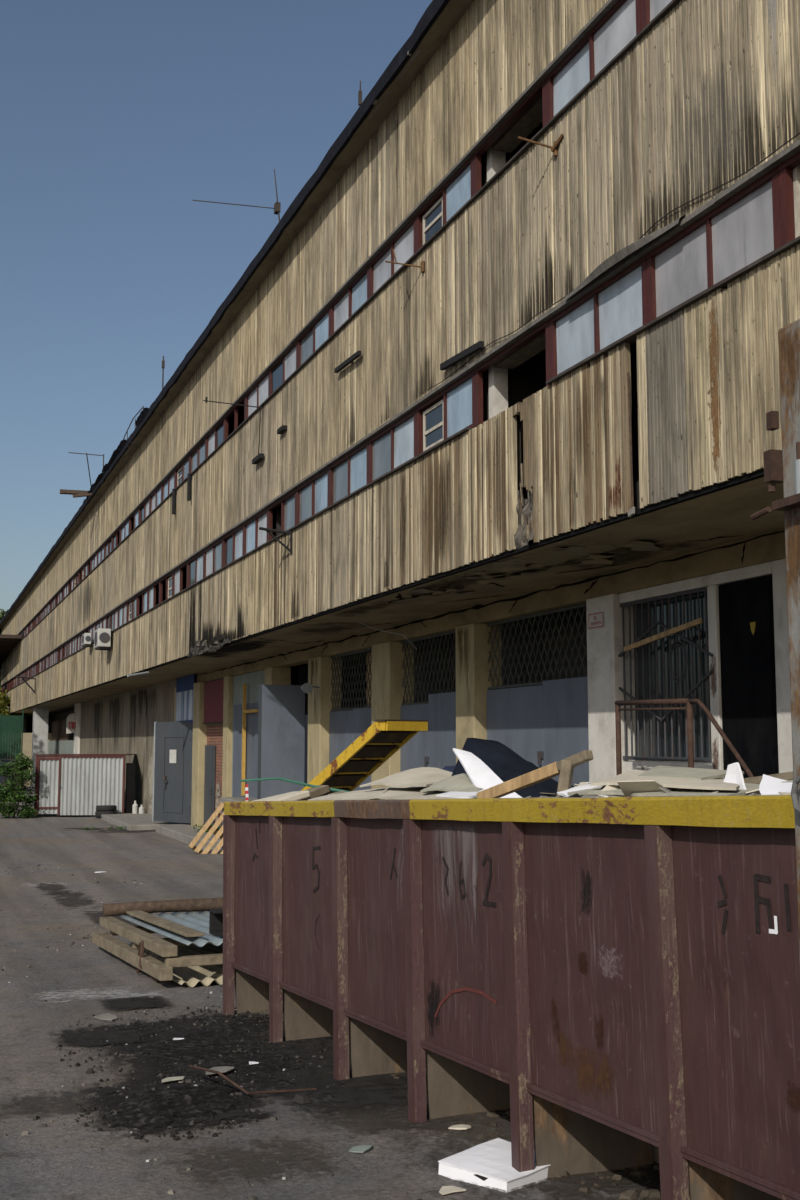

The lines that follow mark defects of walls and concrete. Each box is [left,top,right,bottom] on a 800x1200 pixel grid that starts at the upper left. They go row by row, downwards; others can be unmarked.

damp [519,251,573,327]
corrosion [709,303,721,465]
spalling [521,430,531,499]
damp [189,582,244,653]
crack [196,531,785,677]